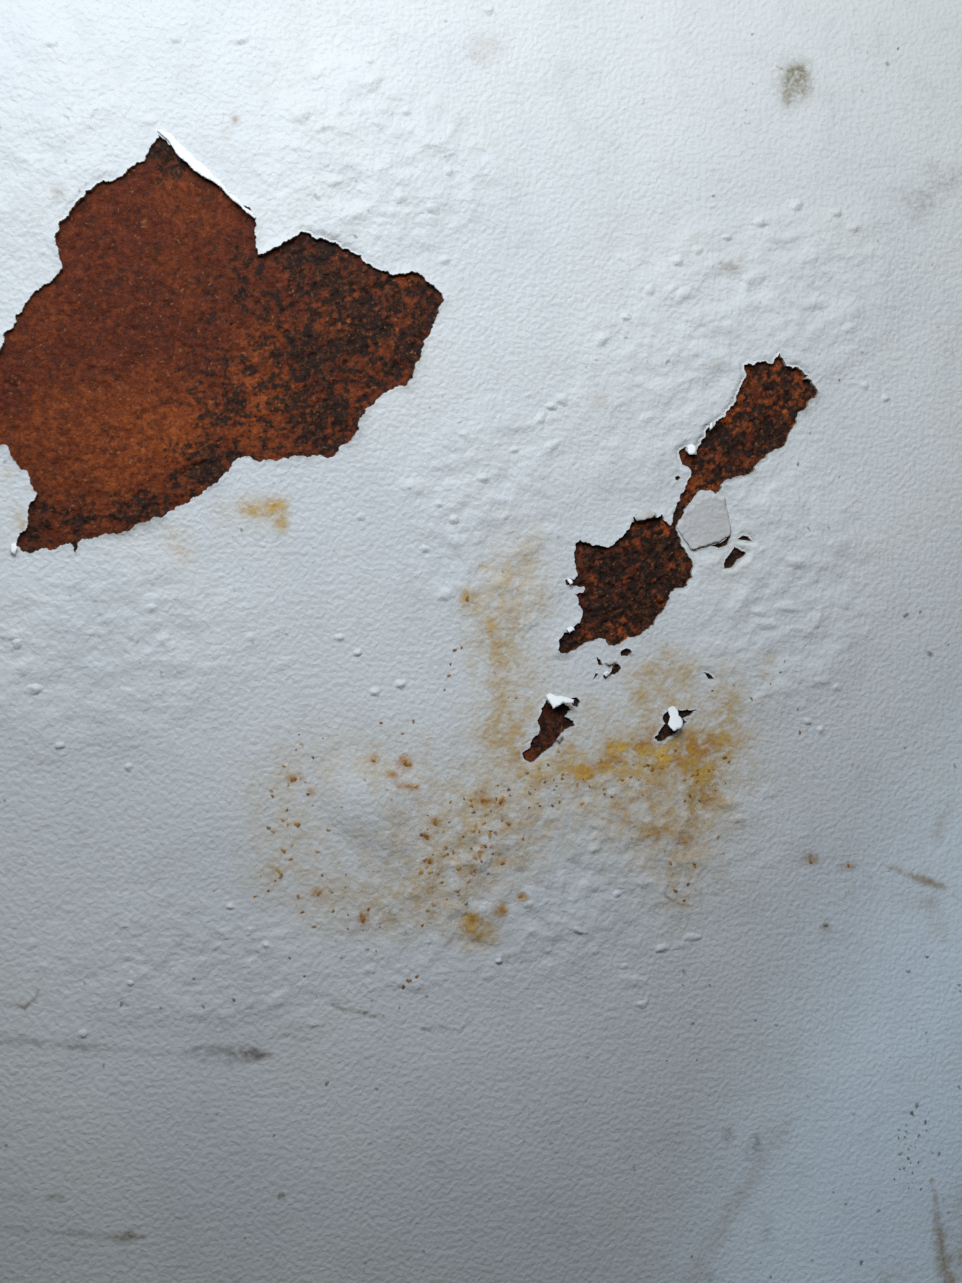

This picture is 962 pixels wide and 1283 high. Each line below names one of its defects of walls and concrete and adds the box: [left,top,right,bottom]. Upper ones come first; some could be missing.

peeling [0,129,444,555]
corrosion [248,500,285,527]
peeling [558,353,818,680]
peeling [522,693,580,763]
corrosion [492,706,735,814]
peeling [654,706,697,742]
corrosion [413,784,511,883]
corrosion [432,890,492,941]